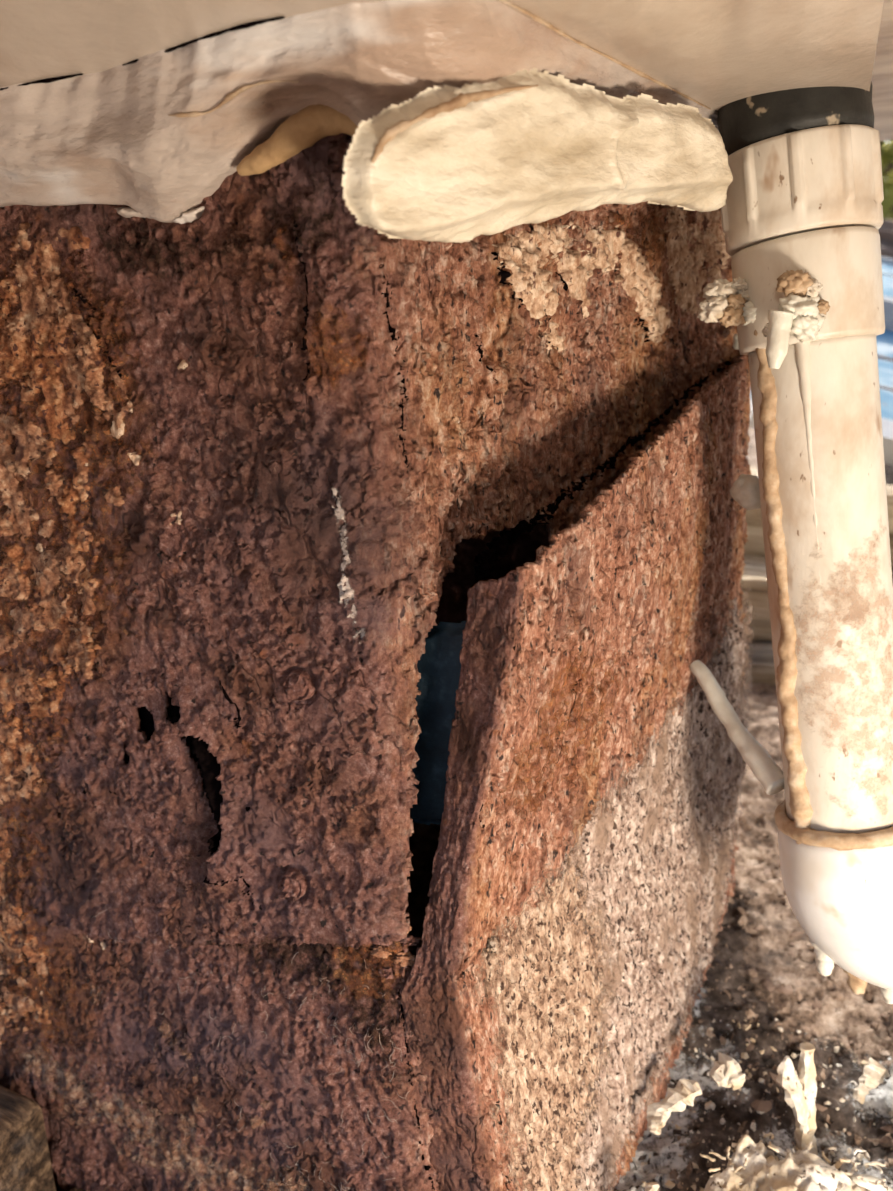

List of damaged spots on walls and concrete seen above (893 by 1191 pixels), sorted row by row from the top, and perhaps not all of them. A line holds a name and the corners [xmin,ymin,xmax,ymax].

crack [474,353,736,579]
crack [567,682,580,721]
crack [397,989,435,1190]
crack [494,1090,502,1125]